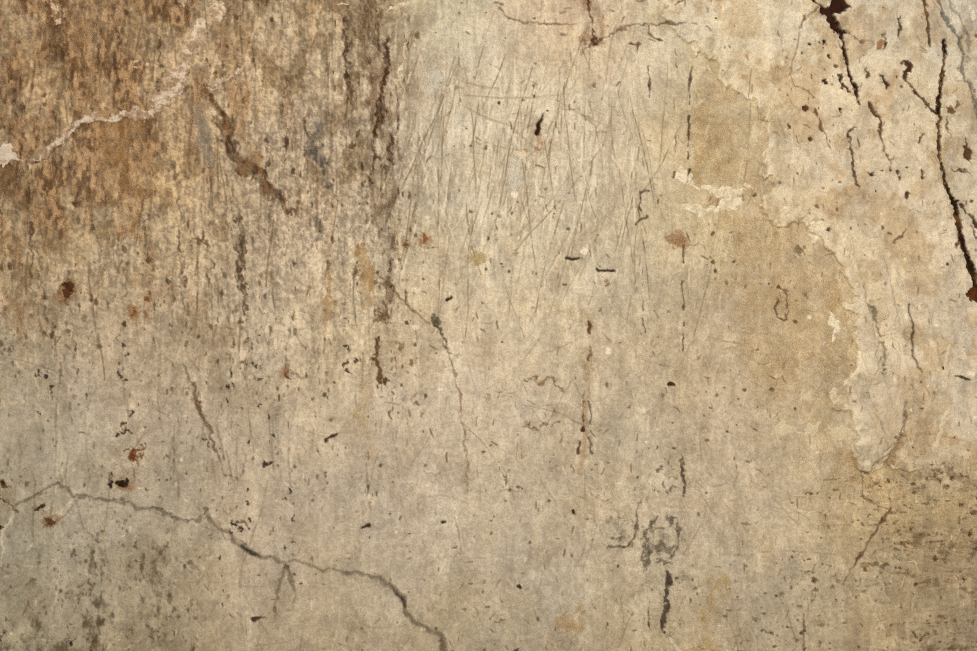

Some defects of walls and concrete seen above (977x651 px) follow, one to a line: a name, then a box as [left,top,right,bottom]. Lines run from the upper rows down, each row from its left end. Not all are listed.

damp [13,0,161,234]
crack [25,35,243,164]
damp [191,85,296,215]
damp [361,6,399,183]
spalling [674,166,754,218]
spalling [809,221,827,243]
crack [801,0,890,187]
crack [901,0,977,302]
damp [371,336,390,388]
spalling [755,410,852,441]
spalling [827,312,841,342]
crack [908,304,922,371]